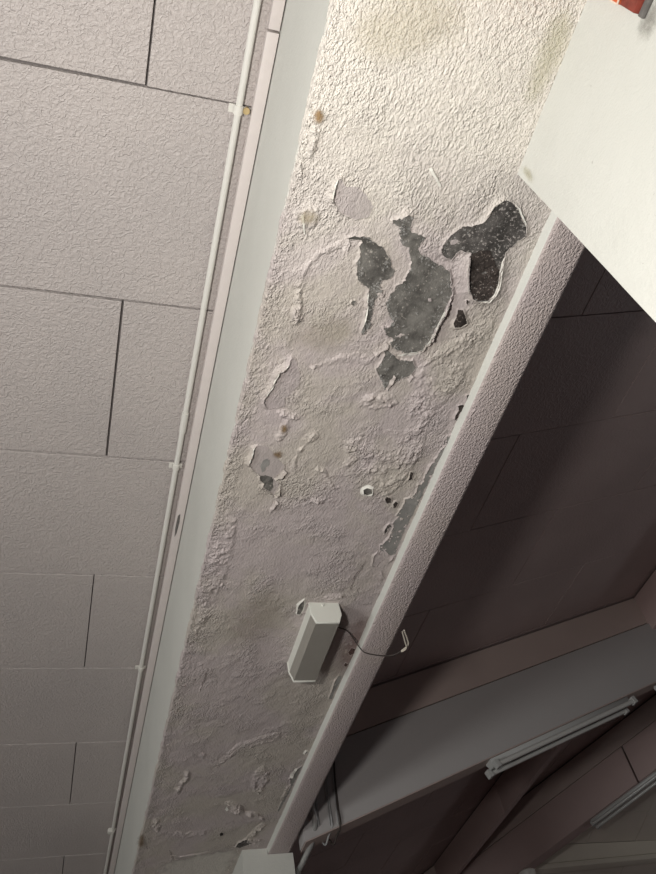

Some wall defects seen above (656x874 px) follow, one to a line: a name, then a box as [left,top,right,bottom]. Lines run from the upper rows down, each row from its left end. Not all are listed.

peeling [326,174,375,221]
spalling [342,195,531,391]
peeling [260,354,303,419]
spalling [451,393,470,421]
peeling [245,444,287,513]
spalling [360,485,374,497]
flaking render [370,434,451,583]
flaking render [277,750,309,811]